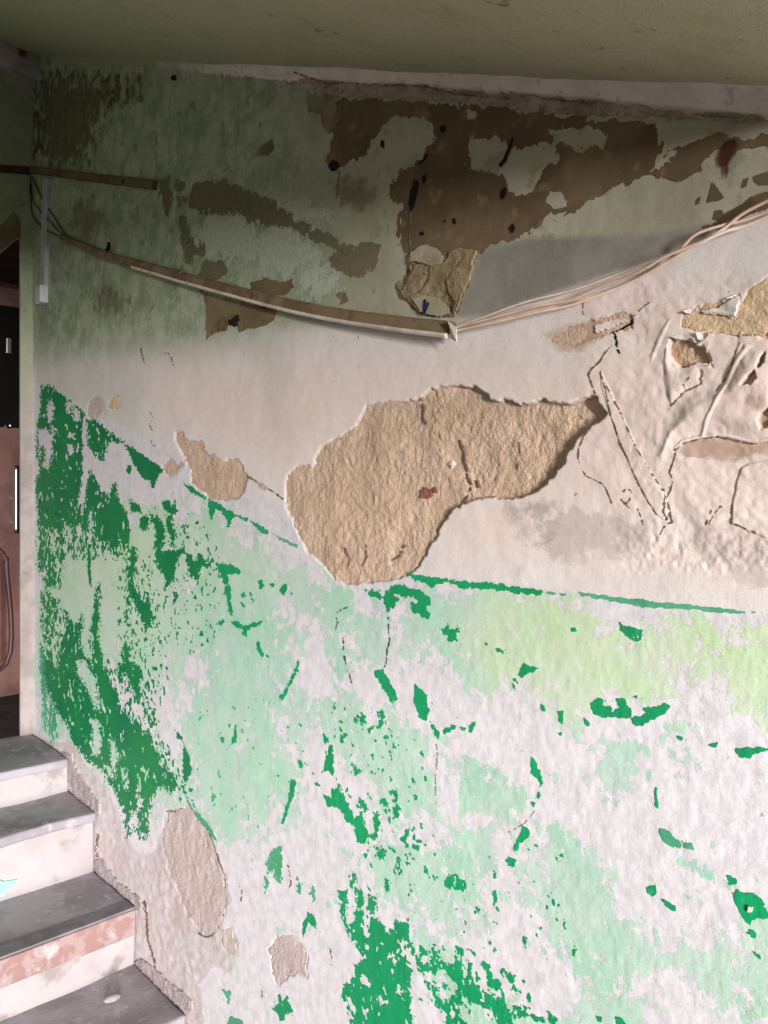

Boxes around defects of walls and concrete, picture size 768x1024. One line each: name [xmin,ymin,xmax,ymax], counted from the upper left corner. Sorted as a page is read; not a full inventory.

leakage [33,68,143,170]
leakage [158,175,381,305]
peeling [294,72,768,318]
corrosion [718,139,738,178]
peeling [200,290,277,340]
crack [577,342,768,535]
peeling [580,592,756,614]
flaking render [33,383,608,955]
peeling [584,695,671,727]
peeling [736,747,768,759]
peeling [268,669,558,1024]
peeling [727,875,768,938]